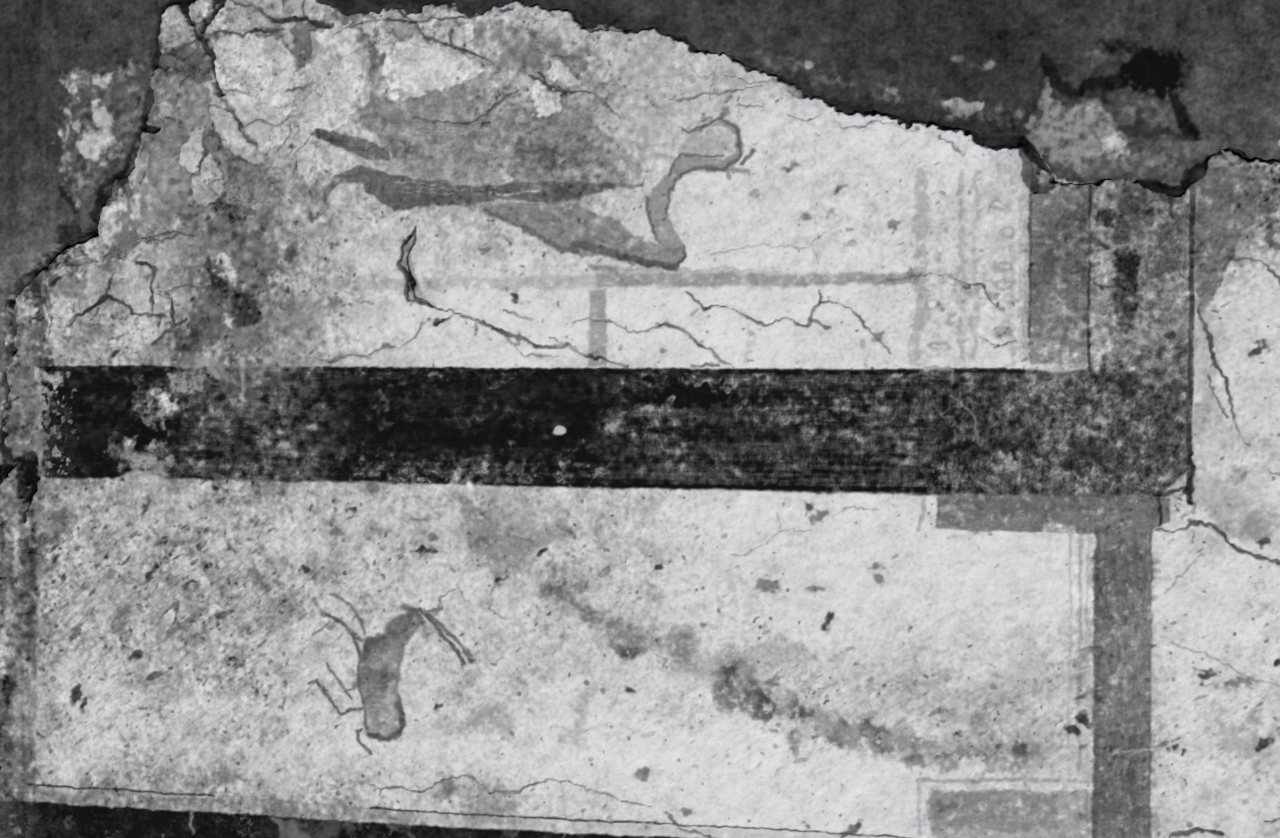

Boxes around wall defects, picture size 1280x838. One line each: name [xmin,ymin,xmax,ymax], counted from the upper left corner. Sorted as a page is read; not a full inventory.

spalling [37,357,60,375]
spalling [5,63,132,346]
peeling [157,101,175,121]
crack [0,0,622,560]
peeling [160,0,484,208]
peeling [532,57,586,118]
crack [306,226,893,369]
crack [572,11,1280,477]
peeling [1061,88,1198,184]
crack [729,506,879,557]
crack [1140,450,1280,595]
crack [1163,636,1280,687]